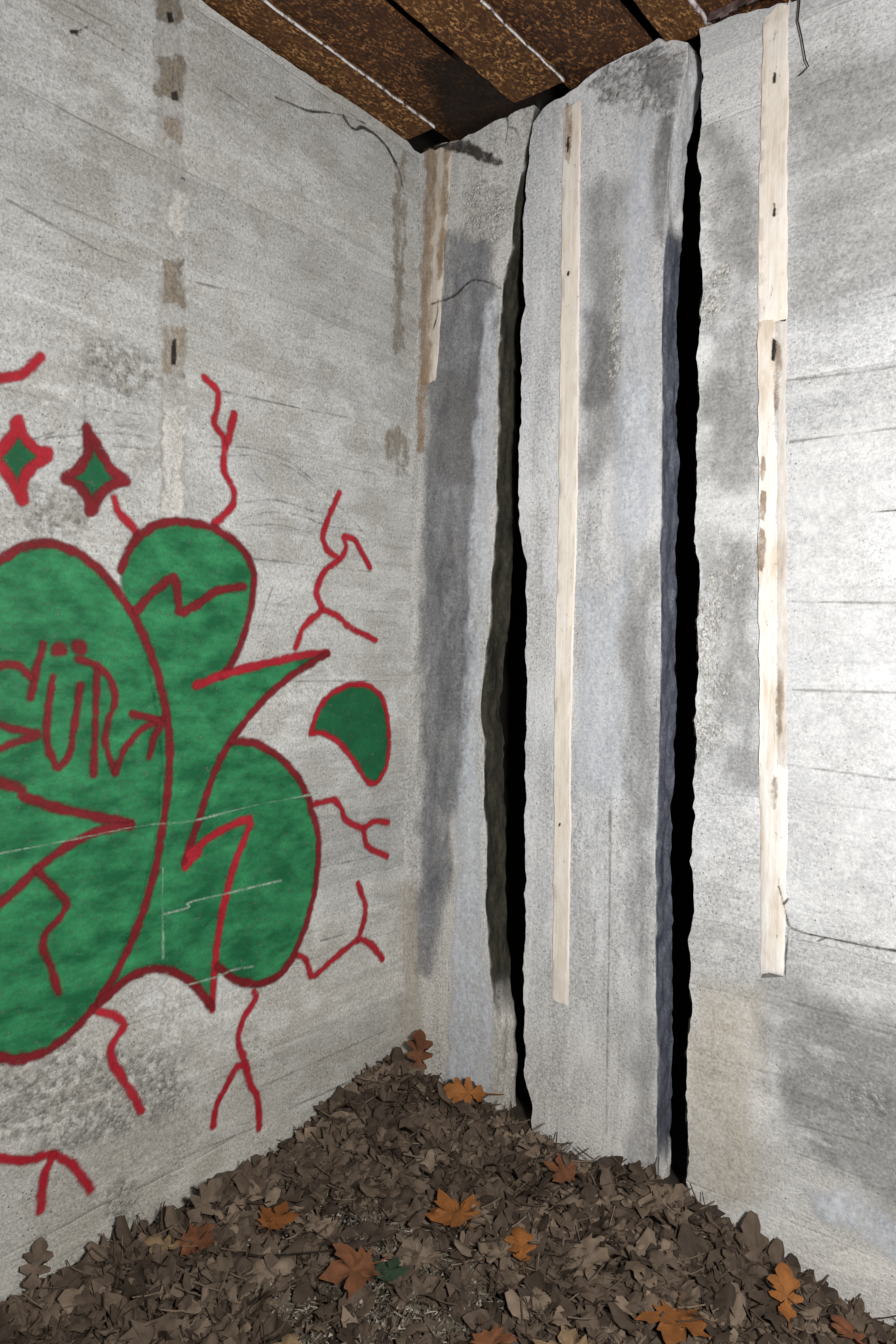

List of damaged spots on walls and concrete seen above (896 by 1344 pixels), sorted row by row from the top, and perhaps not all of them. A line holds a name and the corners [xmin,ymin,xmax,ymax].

crack [276,97,402,183]
leakage [796,67,896,308]
leakage [404,180,513,1099]
crack [431,279,530,1096]
crack [669,119,703,1170]
crack [778,886,896,973]
leakage [691,987,760,1197]
leakage [772,980,896,1197]
leakage [812,1190,896,1257]